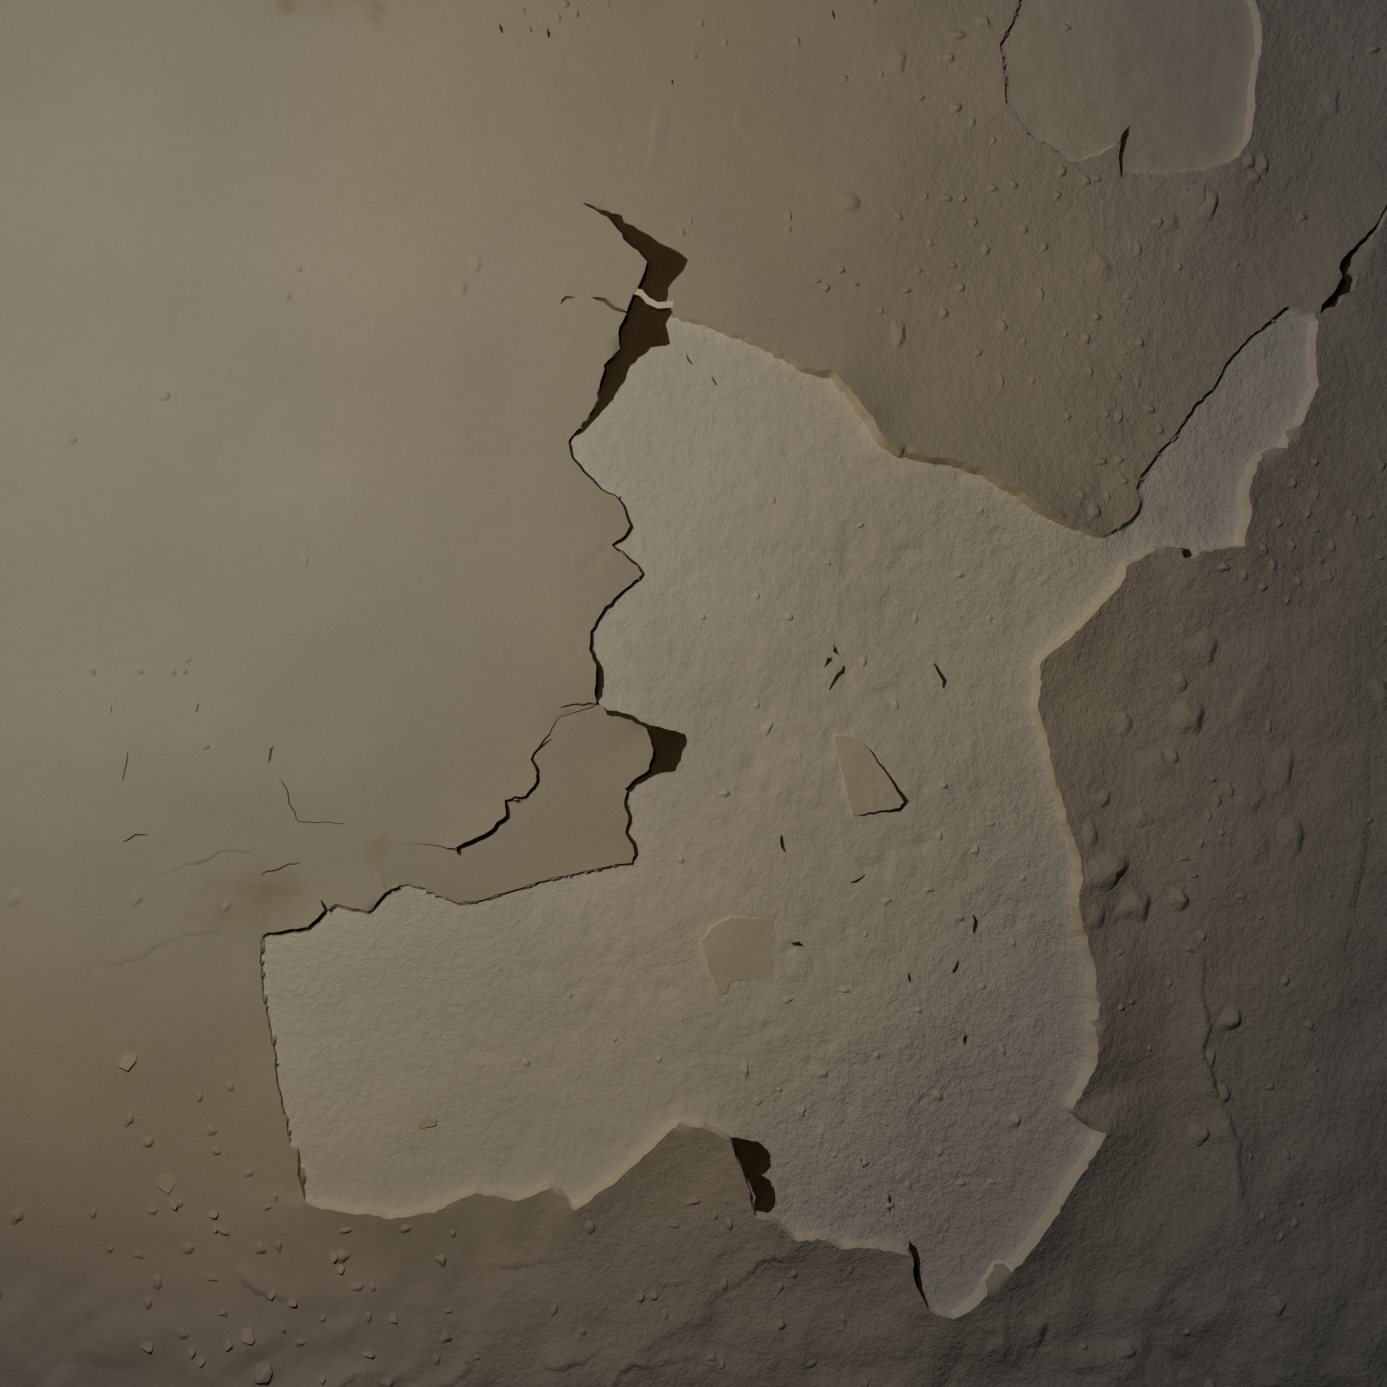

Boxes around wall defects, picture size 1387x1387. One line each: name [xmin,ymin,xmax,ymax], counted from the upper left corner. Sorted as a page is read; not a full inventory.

crack [456,204,716,902]
peeling [261,308,1311,1311]
peeling [1000,0,1255,174]
crack [1116,206,1387,529]